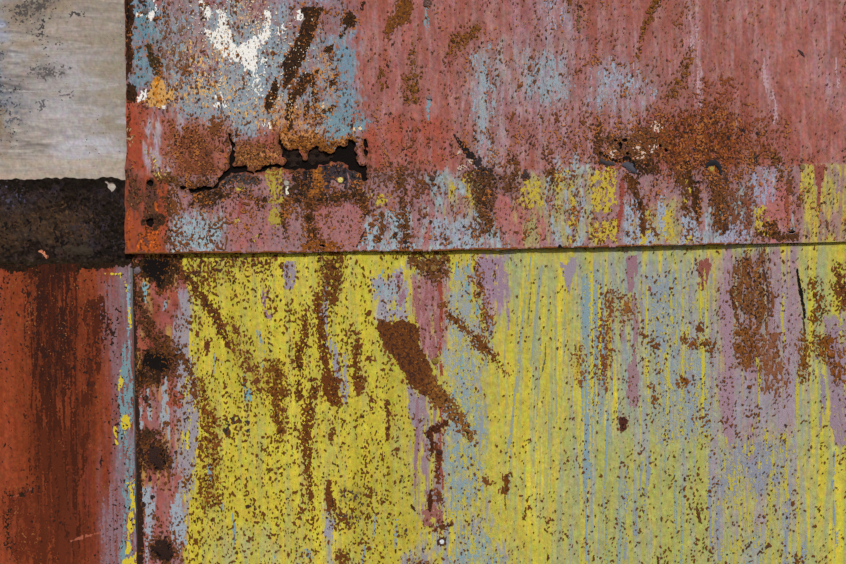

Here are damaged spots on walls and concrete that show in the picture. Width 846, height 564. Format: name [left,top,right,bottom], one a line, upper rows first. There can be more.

peeling [129,0,331,141]
corrosion [1,445,48,560]